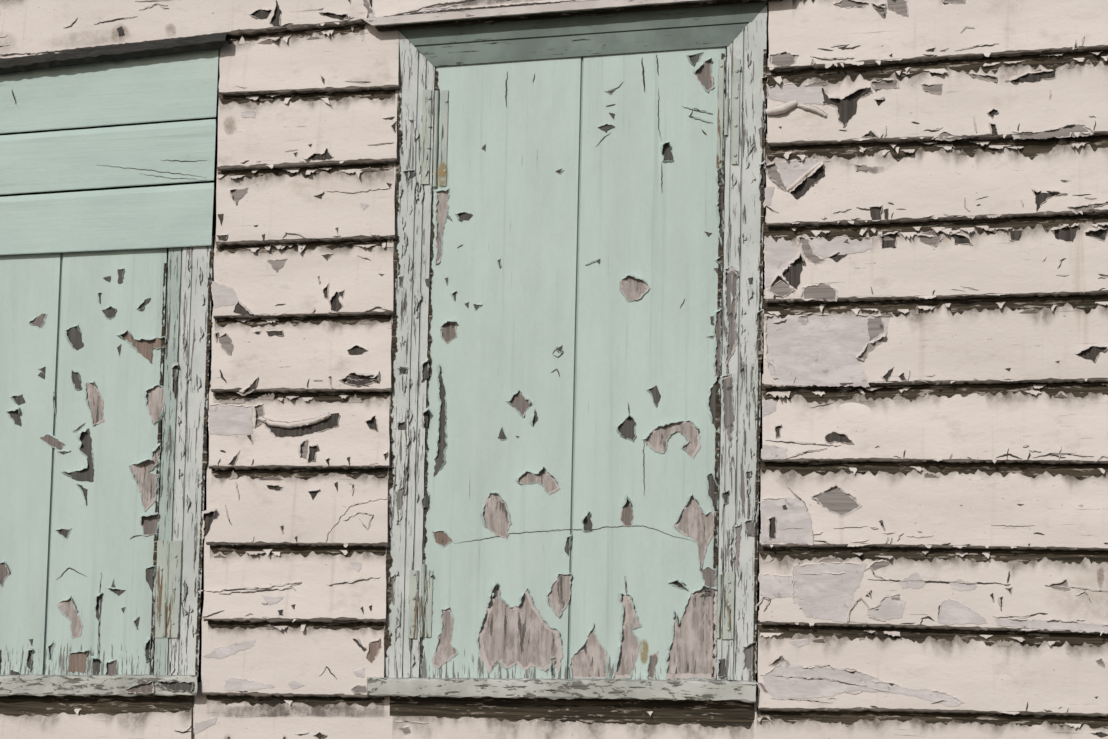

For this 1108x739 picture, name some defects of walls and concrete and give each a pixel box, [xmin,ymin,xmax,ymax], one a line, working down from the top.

peeling [226,0,375,44]
peeling [216,144,428,205]
peeling [748,37,1108,207]
peeling [189,262,391,356]
peeling [215,214,407,287]
peeling [40,369,104,506]
peeling [199,371,390,499]
crack [327,378,411,533]
peeling [431,180,1108,737]
peeling [201,508,386,571]
crack [460,525,689,543]
crack [728,440,868,612]